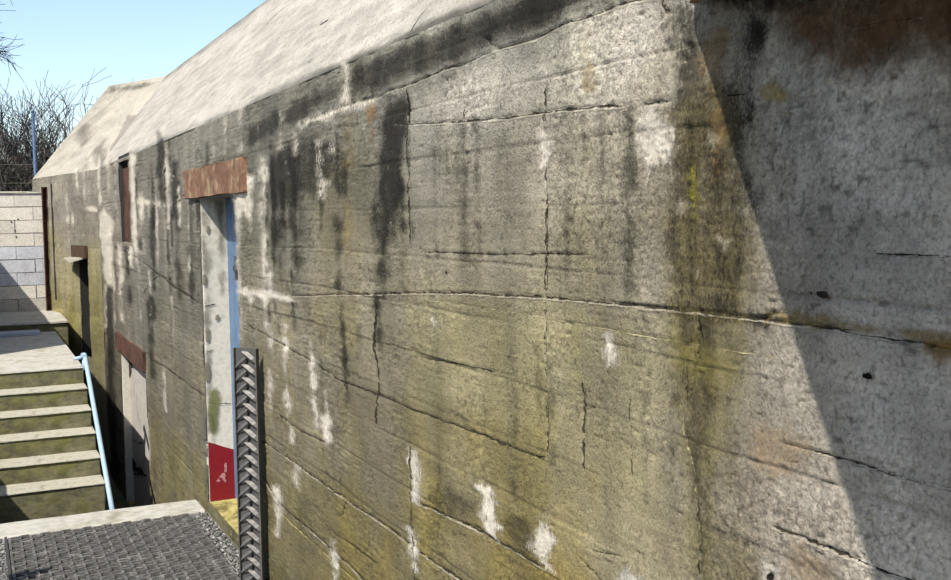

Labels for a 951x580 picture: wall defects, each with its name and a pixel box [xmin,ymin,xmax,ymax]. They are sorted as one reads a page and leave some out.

water stain [233,0,572,378]
water stain [635,6,776,328]
crack [248,0,951,580]
efflorescence [308,353,332,443]
water stain [406,526,419,571]
efflorescence [407,450,421,504]
efflorescence [475,484,502,542]
efflorescence [528,523,555,569]